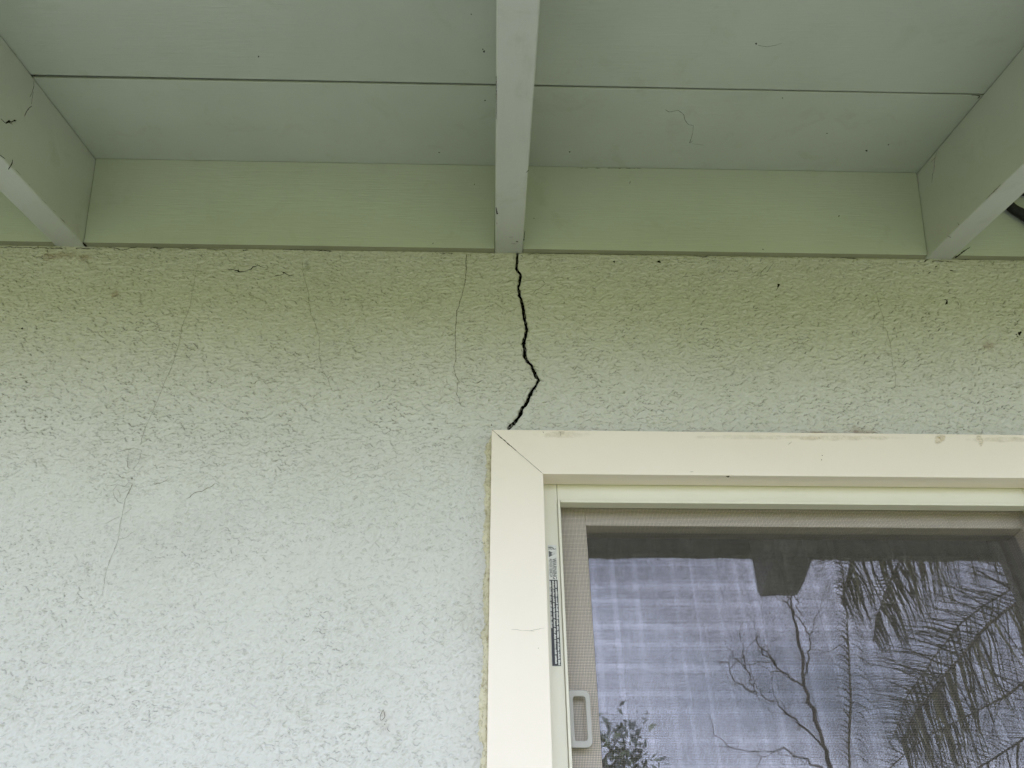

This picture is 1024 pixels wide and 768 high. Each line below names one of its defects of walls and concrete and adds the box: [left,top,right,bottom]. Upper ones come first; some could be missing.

crack [452,232,545,430]